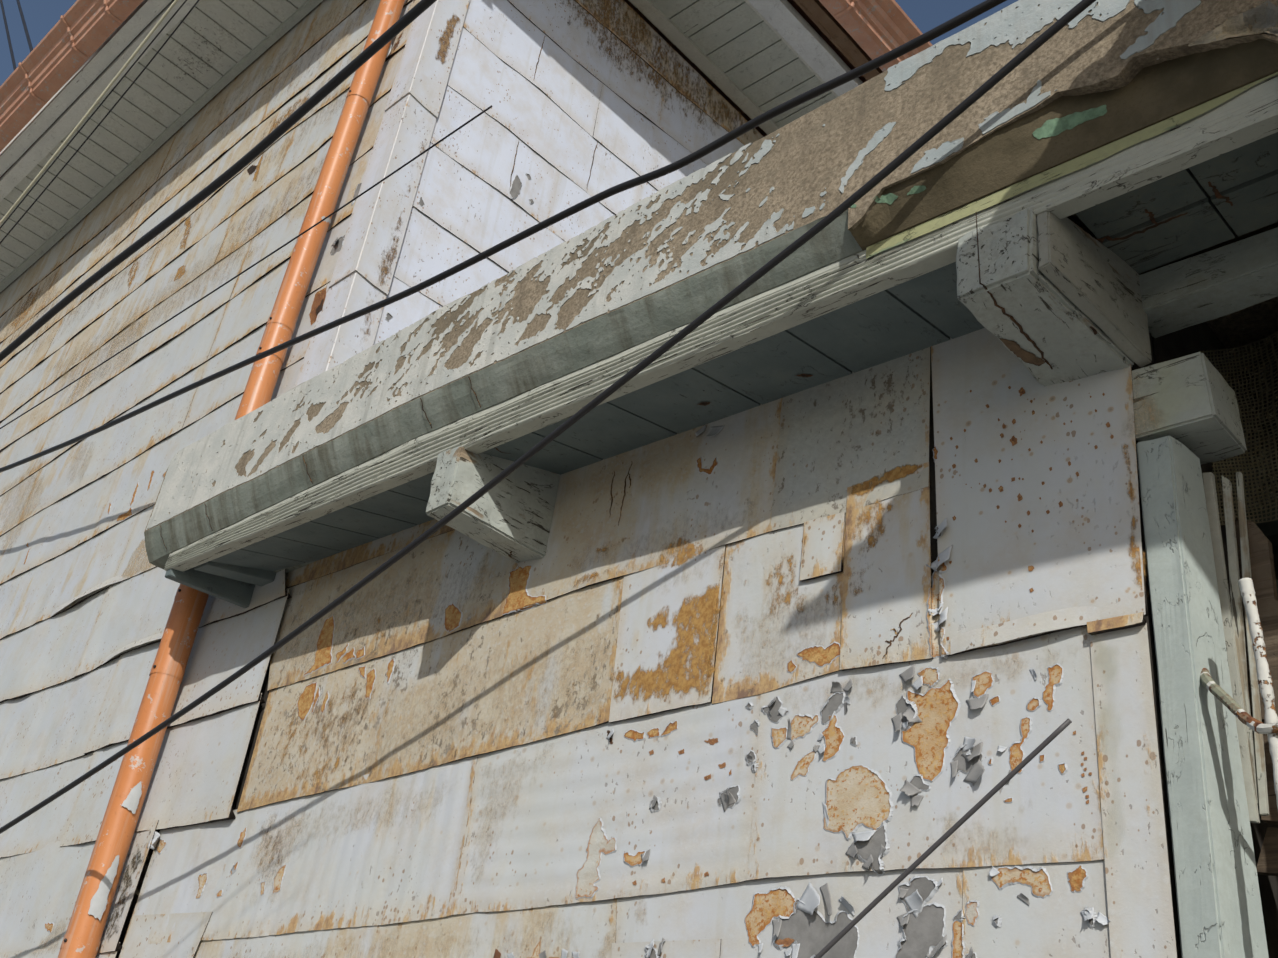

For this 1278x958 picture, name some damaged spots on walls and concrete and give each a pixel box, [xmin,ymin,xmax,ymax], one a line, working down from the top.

peeling [884,0,1201,91]
peeling [146,122,896,530]
crack [976,212,1053,370]
crack [610,461,632,526]
rust [852,446,940,552]
rust [1129,516,1145,586]
rust [610,584,723,701]
crack [882,612,913,659]
rust [265,615,395,784]
peeling [745,679,858,781]
peeling [822,518,1064,876]
peeling [744,882,860,958]